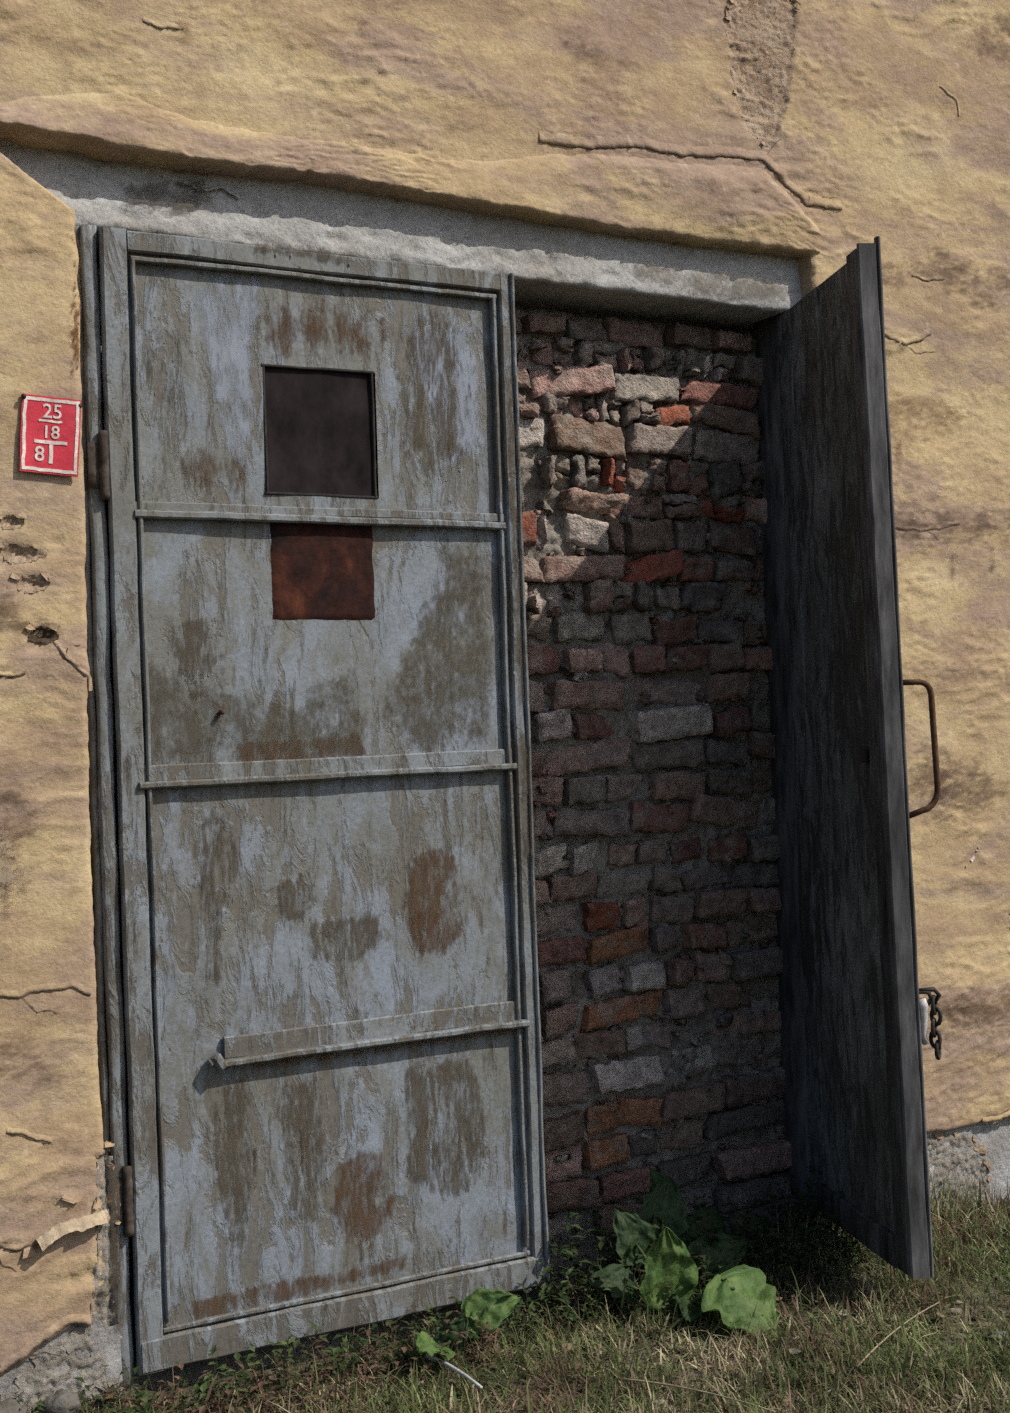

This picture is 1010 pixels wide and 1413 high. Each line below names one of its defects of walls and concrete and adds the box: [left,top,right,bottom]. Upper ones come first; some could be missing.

flaking render [724,0,803,148]
crack [539,131,842,210]
crack [885,329,933,354]
flaking render [0,513,51,593]
crack [0,669,25,679]
flaking render [25,623,60,644]
crack [52,640,92,691]
corrosion [406,849,461,957]
crack [0,981,93,1013]
flaking render [927,1131,993,1212]
flaking render [0,1141,128,1412]
corrosion [194,1153,405,1320]